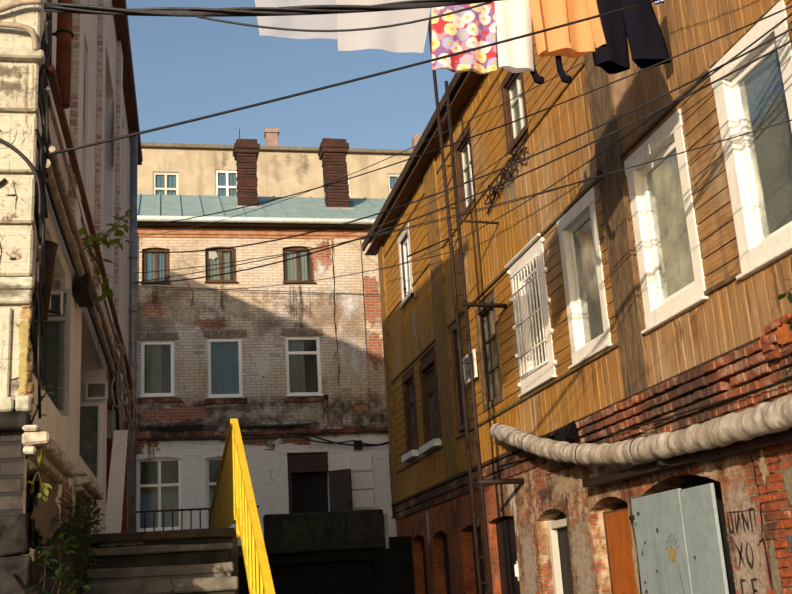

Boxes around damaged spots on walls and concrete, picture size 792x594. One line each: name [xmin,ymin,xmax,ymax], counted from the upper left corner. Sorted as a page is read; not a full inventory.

spalling [18,290,35,404]
damp [342,290,359,319]
flaking render [363,276,384,371]
flaking render [242,436,328,451]
flaking render [726,442,792,594]